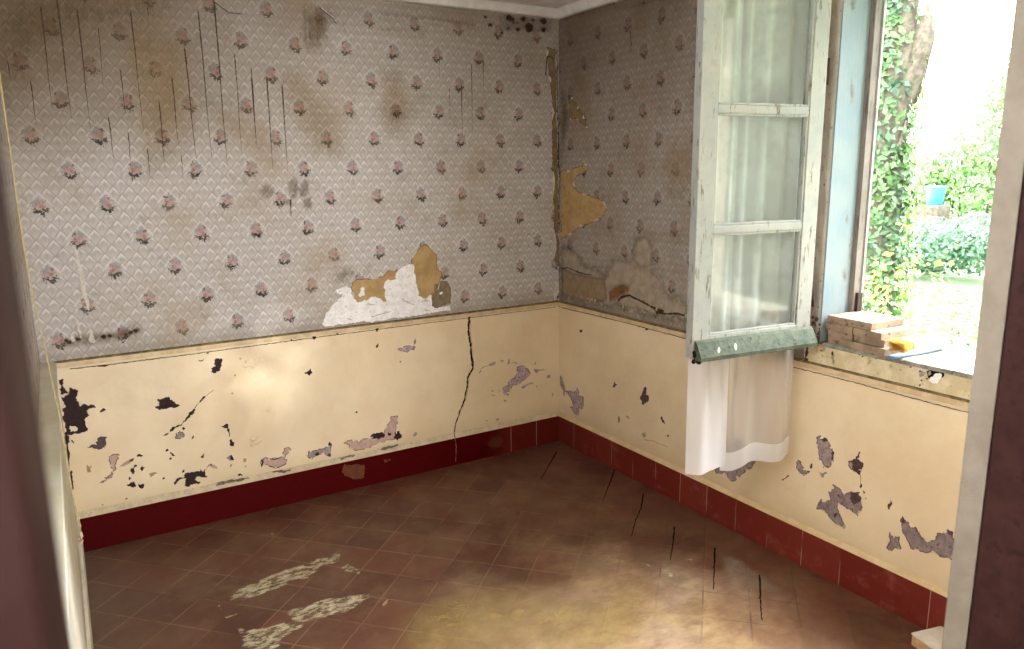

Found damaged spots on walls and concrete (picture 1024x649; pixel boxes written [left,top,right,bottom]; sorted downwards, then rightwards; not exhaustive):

leakage [484,15,547,34]
leakage [184,47,196,154]
leakage [198,11,212,156]
leakage [213,0,227,158]
flaking render [322,252,451,334]
peeling [58,379,249,500]
peeling [307,415,417,479]
crack [70,267,686,461]
crack [631,493,644,536]
peeling [782,435,867,529]
crack [731,356,968,440]
peeling [886,517,954,560]